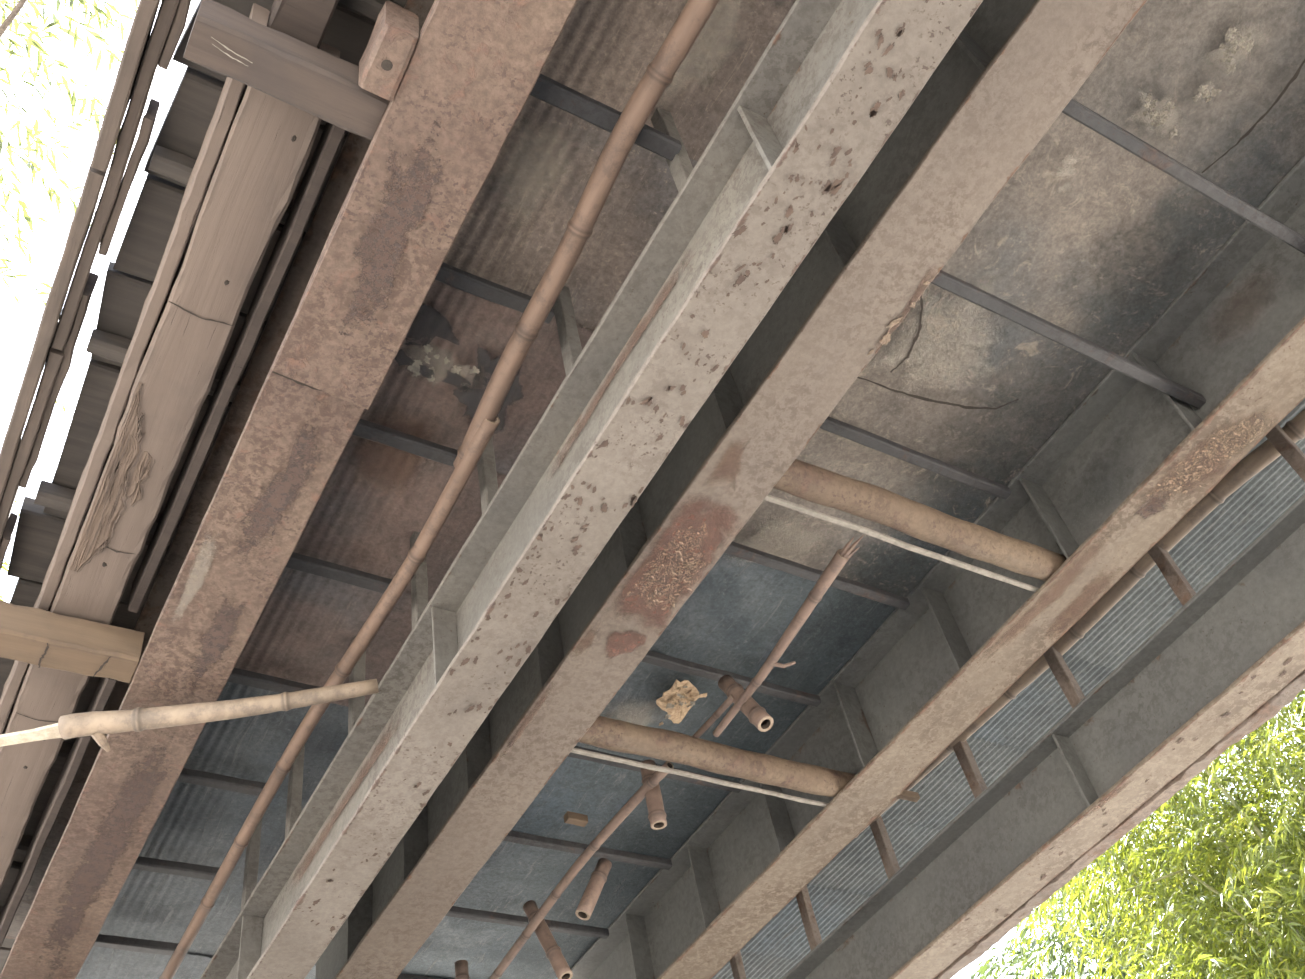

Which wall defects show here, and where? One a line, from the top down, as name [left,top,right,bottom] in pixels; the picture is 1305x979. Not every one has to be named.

crack [1201,59,1305,173]
peeling [395,344,480,410]
crack [857,295,1019,409]
rust [606,499,739,658]